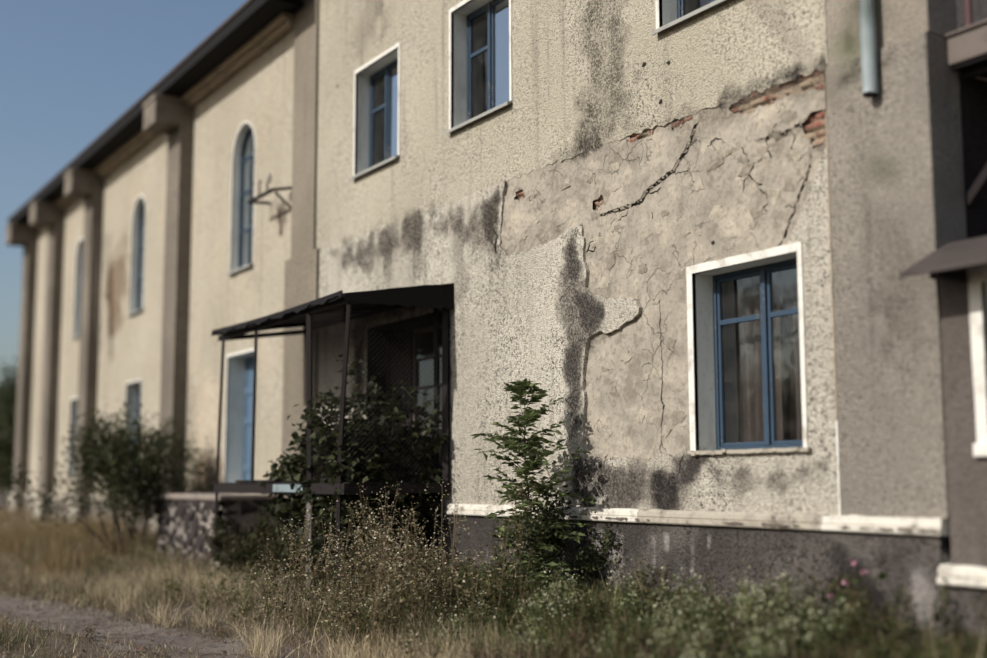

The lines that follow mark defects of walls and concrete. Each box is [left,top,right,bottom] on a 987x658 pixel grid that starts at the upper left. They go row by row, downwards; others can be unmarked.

leakage [331,209,422,269]
leakage [434,192,500,243]
leakage [559,235,604,437]
flaking render [500,70,826,461]
crack [659,304,685,477]
crack [585,104,812,253]
leakage [572,450,704,510]